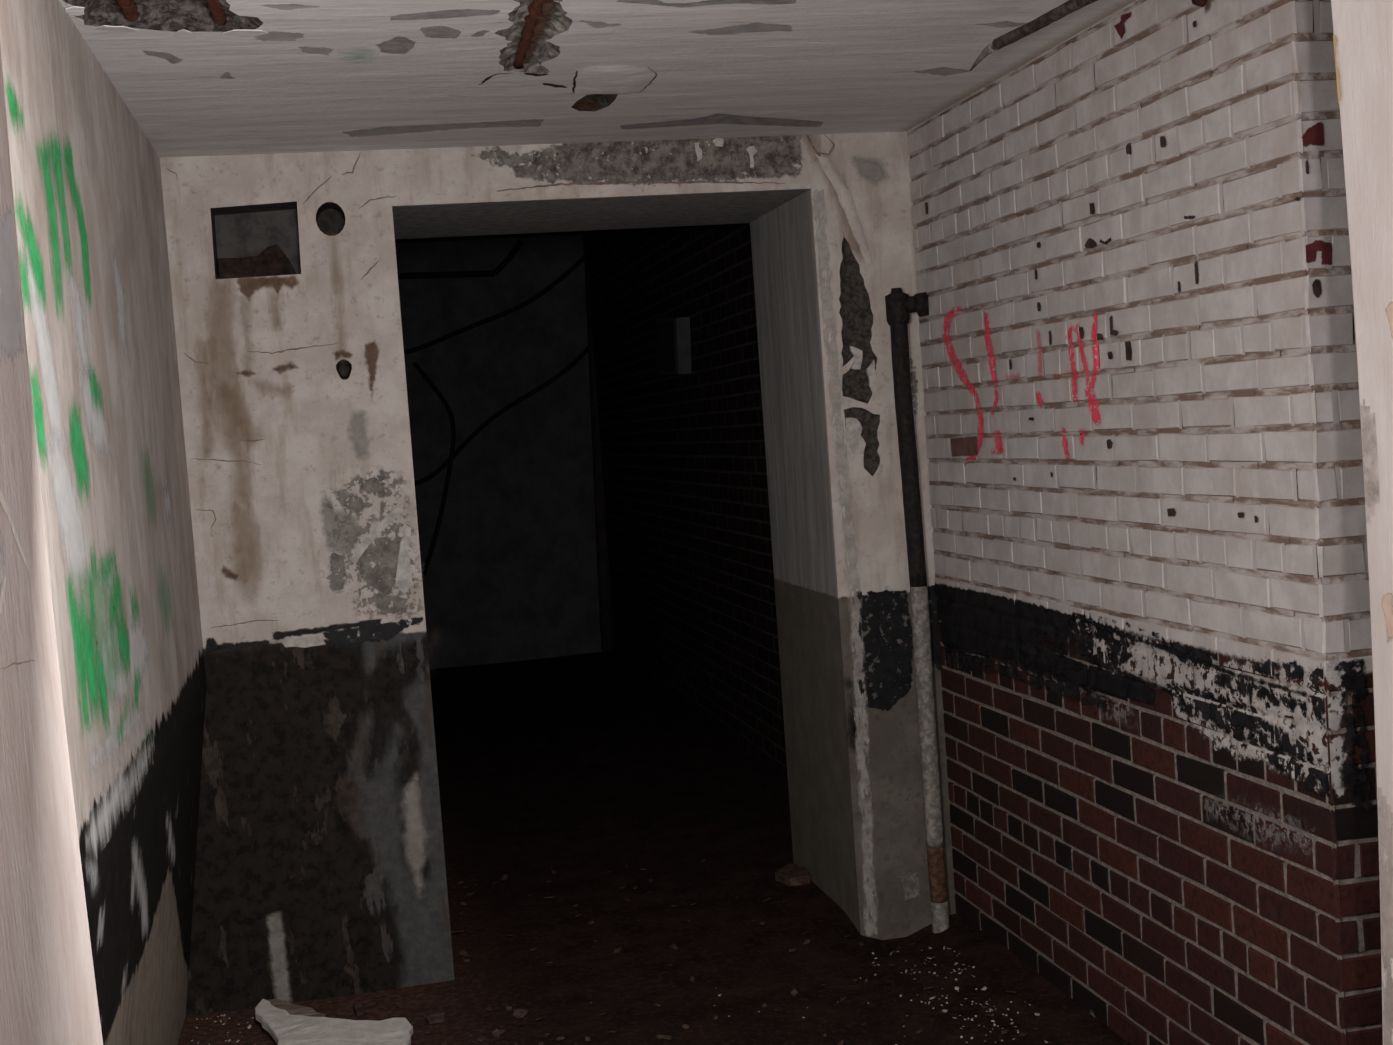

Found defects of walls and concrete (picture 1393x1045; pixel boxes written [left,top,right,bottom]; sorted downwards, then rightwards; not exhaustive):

spalling [59,0,332,55]
spalling [377,0,621,85]
peeling [343,119,543,137]
flaking render [480,114,823,186]
peeling [0,207,24,366]
peeling [1305,240,1332,298]
peeling [1079,316,1132,361]
flaking render [951,437,977,456]
peeling [813,190,913,936]
peeling [80,470,423,1045]
damp [186,630,438,1016]
peeling [927,583,1393,1045]